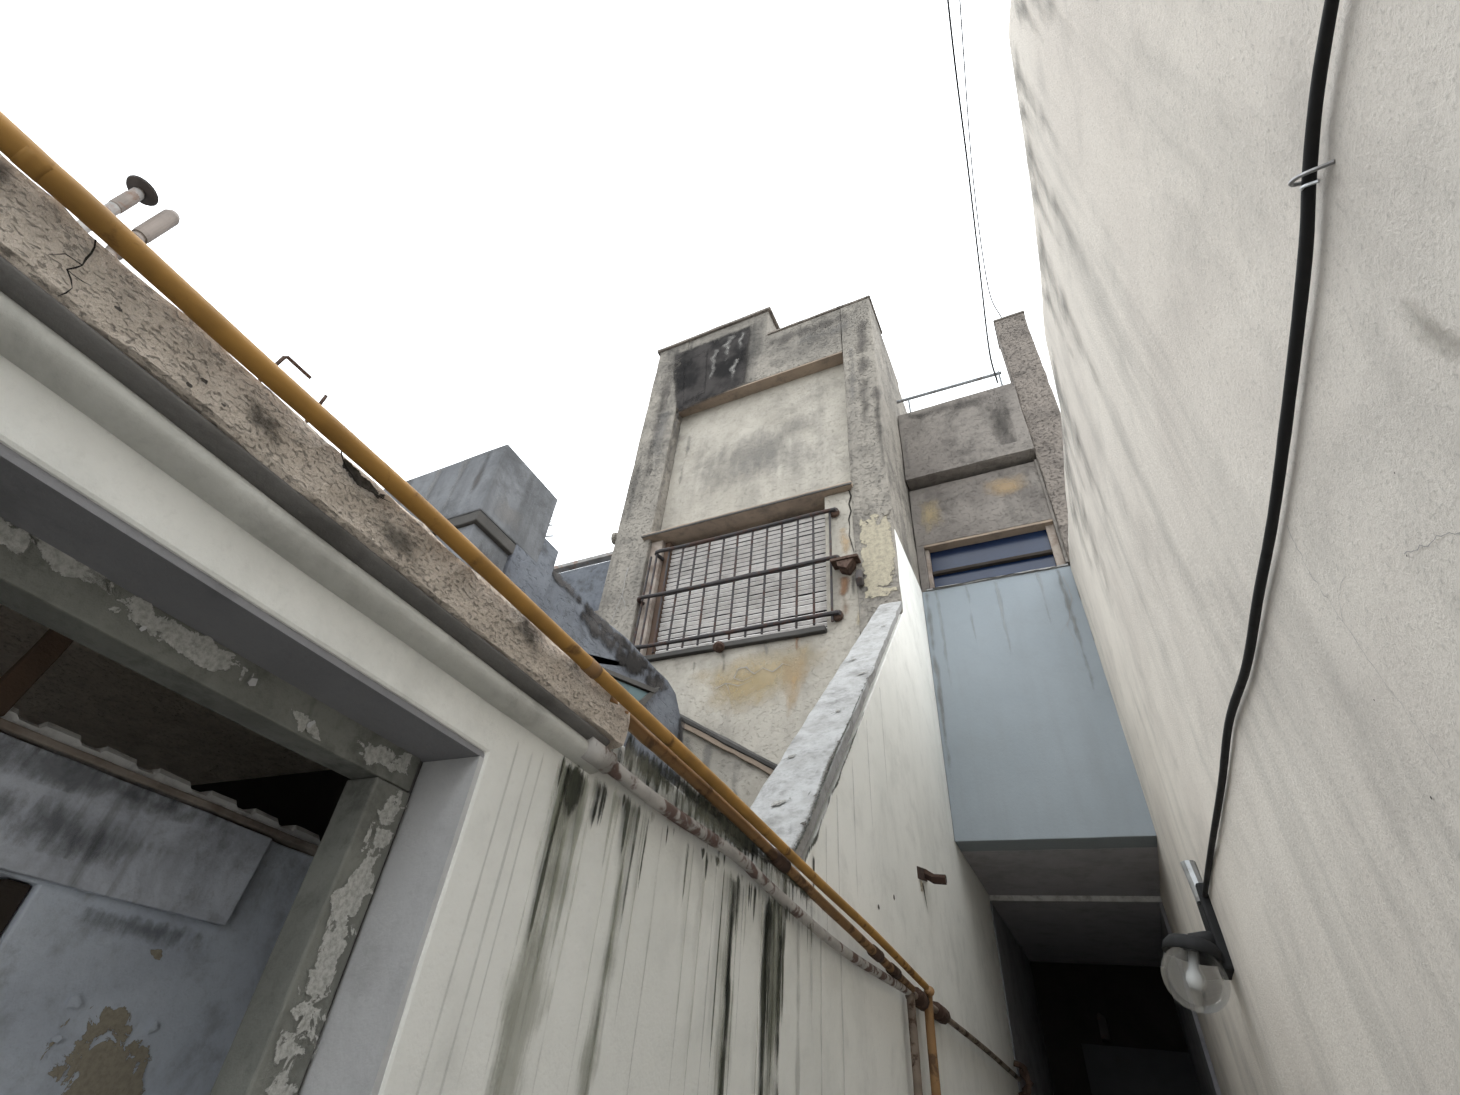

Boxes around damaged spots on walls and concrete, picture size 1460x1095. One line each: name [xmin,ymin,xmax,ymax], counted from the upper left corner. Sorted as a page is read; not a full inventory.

crack [48,239,97,296]
leakage [654,326,750,441]
spalling [341,451,391,503]
peeling [0,517,258,686]
peeling [859,507,897,599]
peeling [291,708,321,741]
peeling [265,740,412,1095]
leakage [527,756,649,978]
leakage [611,734,815,1095]
peeling [41,994,157,1095]